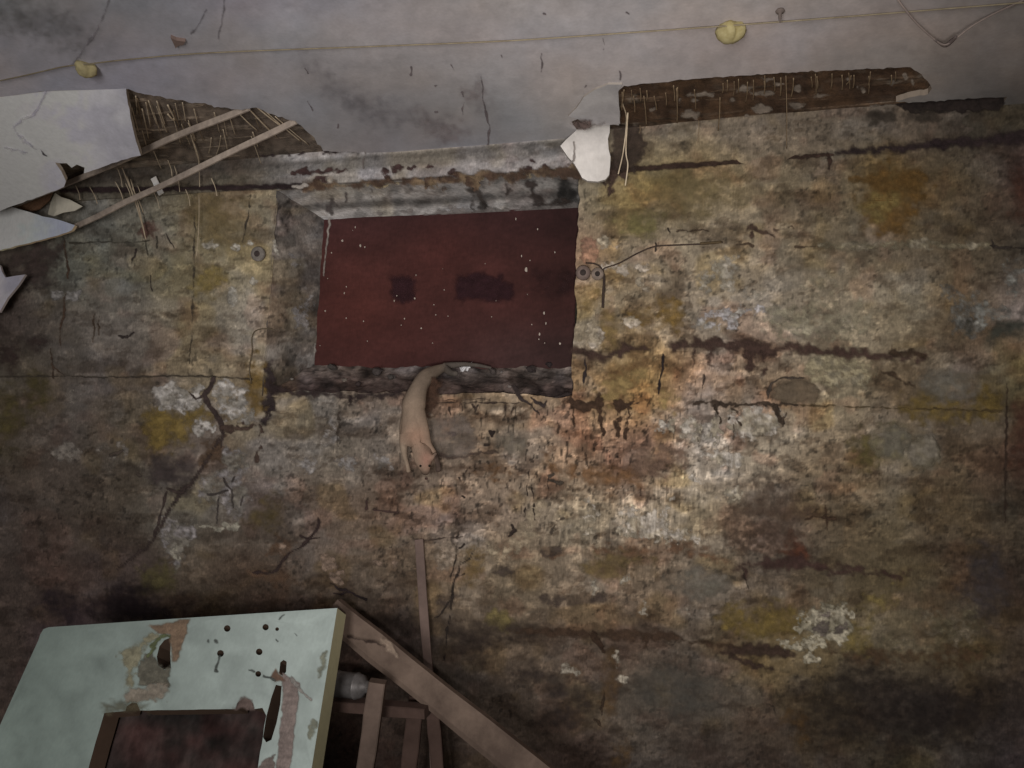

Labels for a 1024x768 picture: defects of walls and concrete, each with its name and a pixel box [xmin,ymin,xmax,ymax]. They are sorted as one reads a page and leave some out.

spalling [620,69,1005,149]
water stain [868,112,895,124]
crack [4,237,264,566]
crack [252,518,320,574]